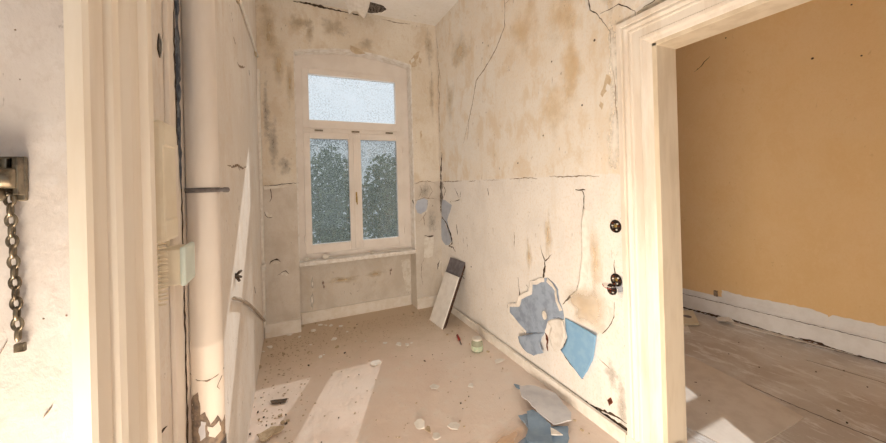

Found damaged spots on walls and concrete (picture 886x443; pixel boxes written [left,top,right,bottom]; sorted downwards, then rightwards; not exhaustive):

peeling [344,0,386,18]
crack [585,0,634,43]
crack [464,0,509,140]
peeling [415,181,454,258]
crack [440,155,462,235]
peeling [507,251,596,379]
peeling [191,393,226,443]